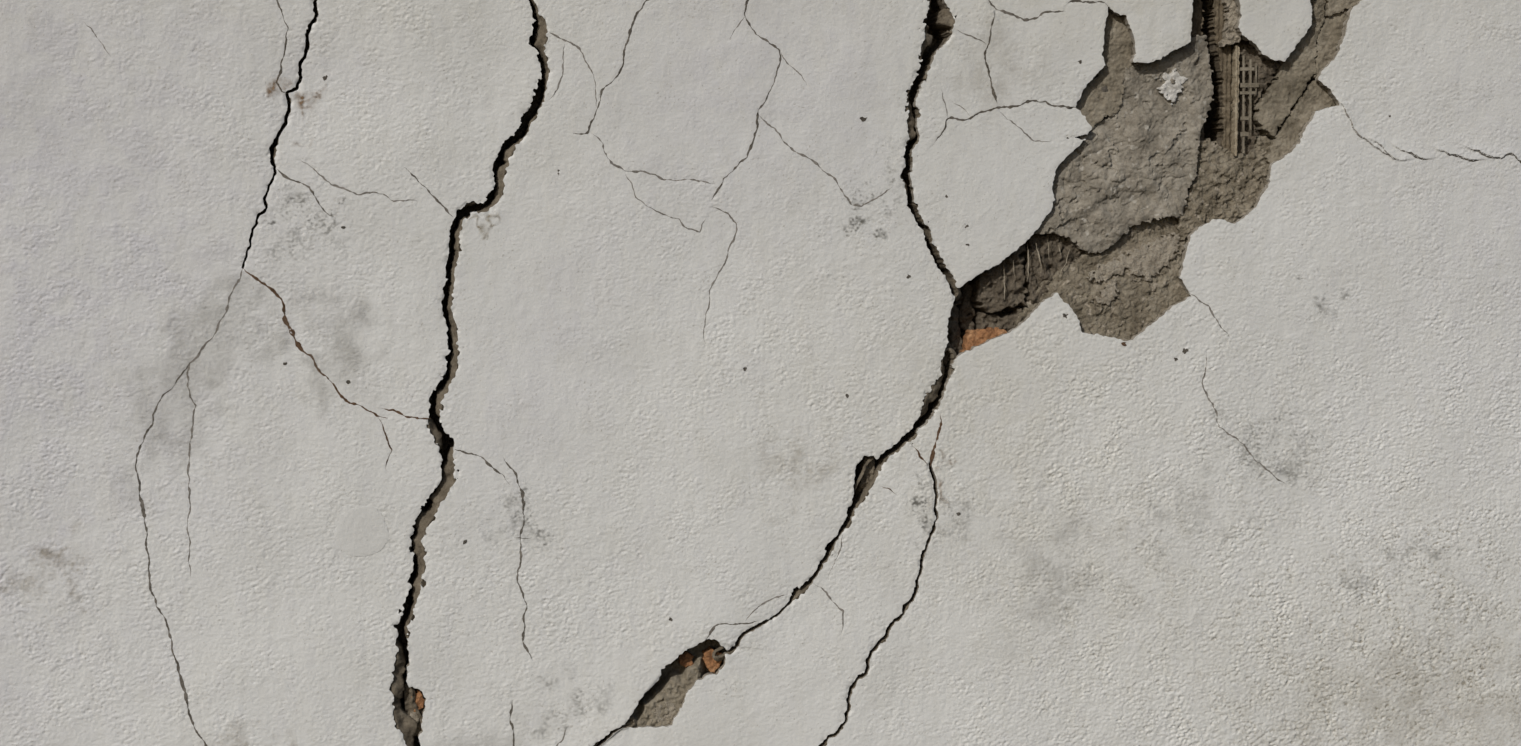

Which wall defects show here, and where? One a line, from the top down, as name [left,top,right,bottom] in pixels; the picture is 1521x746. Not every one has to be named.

flaking render [942,0,1359,372]
crack [1343,106,1521,163]
crack [135,0,1107,746]
crack [1191,294,1284,483]
flaking render [624,639,724,727]